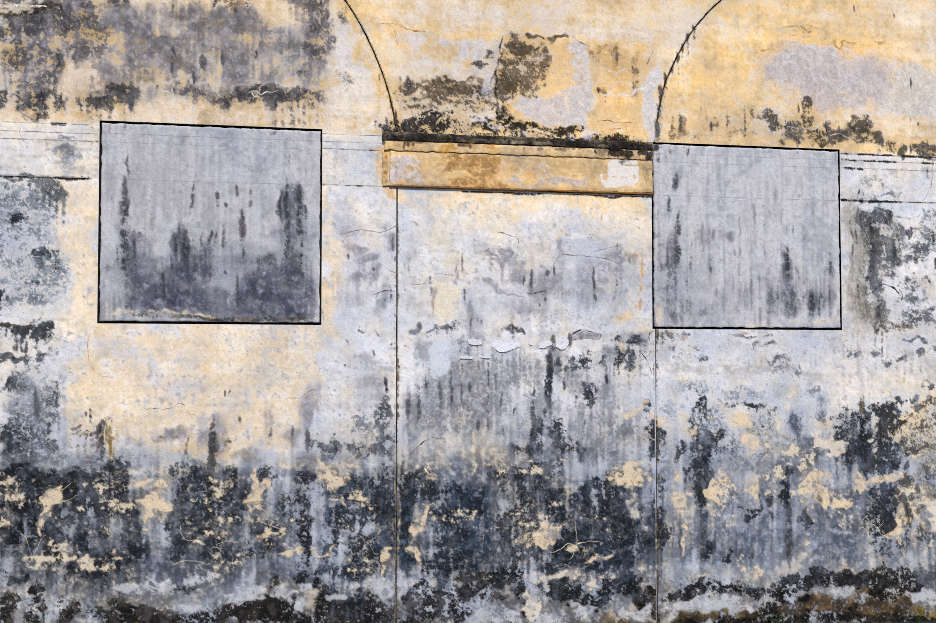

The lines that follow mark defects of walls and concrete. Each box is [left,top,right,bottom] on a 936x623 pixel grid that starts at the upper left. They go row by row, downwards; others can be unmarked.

water stain [0,0,347,134]
peeling [440,39,486,61]
peeling [508,40,662,142]
water stain [0,135,936,623]
peeling [428,329,602,377]
peeling [672,471,686,511]
peeling [703,412,936,546]
peeling [24,540,121,571]